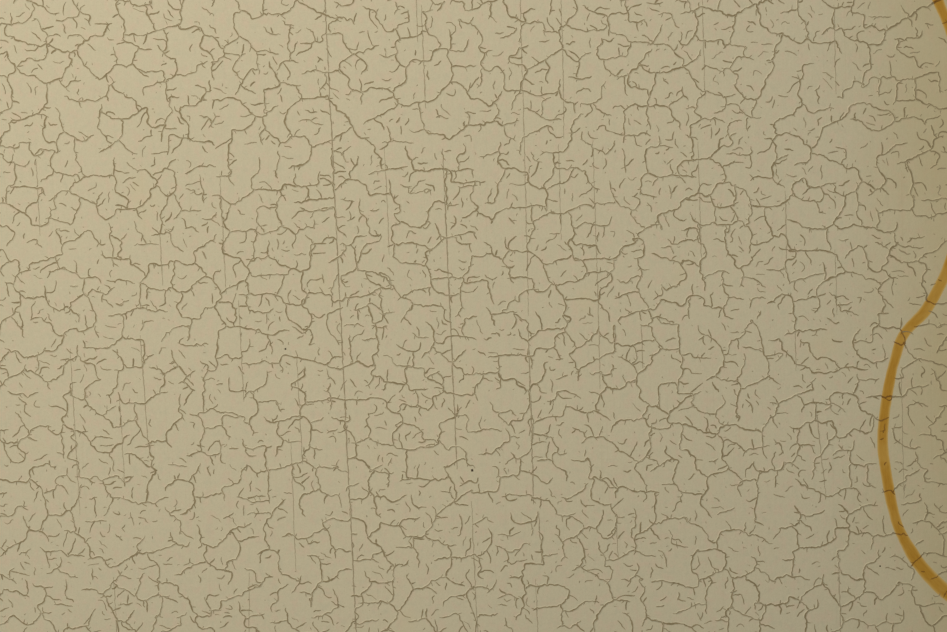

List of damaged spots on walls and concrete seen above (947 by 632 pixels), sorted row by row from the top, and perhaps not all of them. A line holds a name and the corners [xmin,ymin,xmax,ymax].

crack [646,0,683,28]
crack [199,114,223,130]
crack [297,108,330,135]
crack [185,160,216,174]
crack [186,174,207,203]
crack [400,180,435,194]
crack [133,221,159,246]
crack [882,404,947,495]
crack [0,500,28,524]
crack [453,514,493,536]
crack [498,512,539,538]
crack [0,562,42,602]